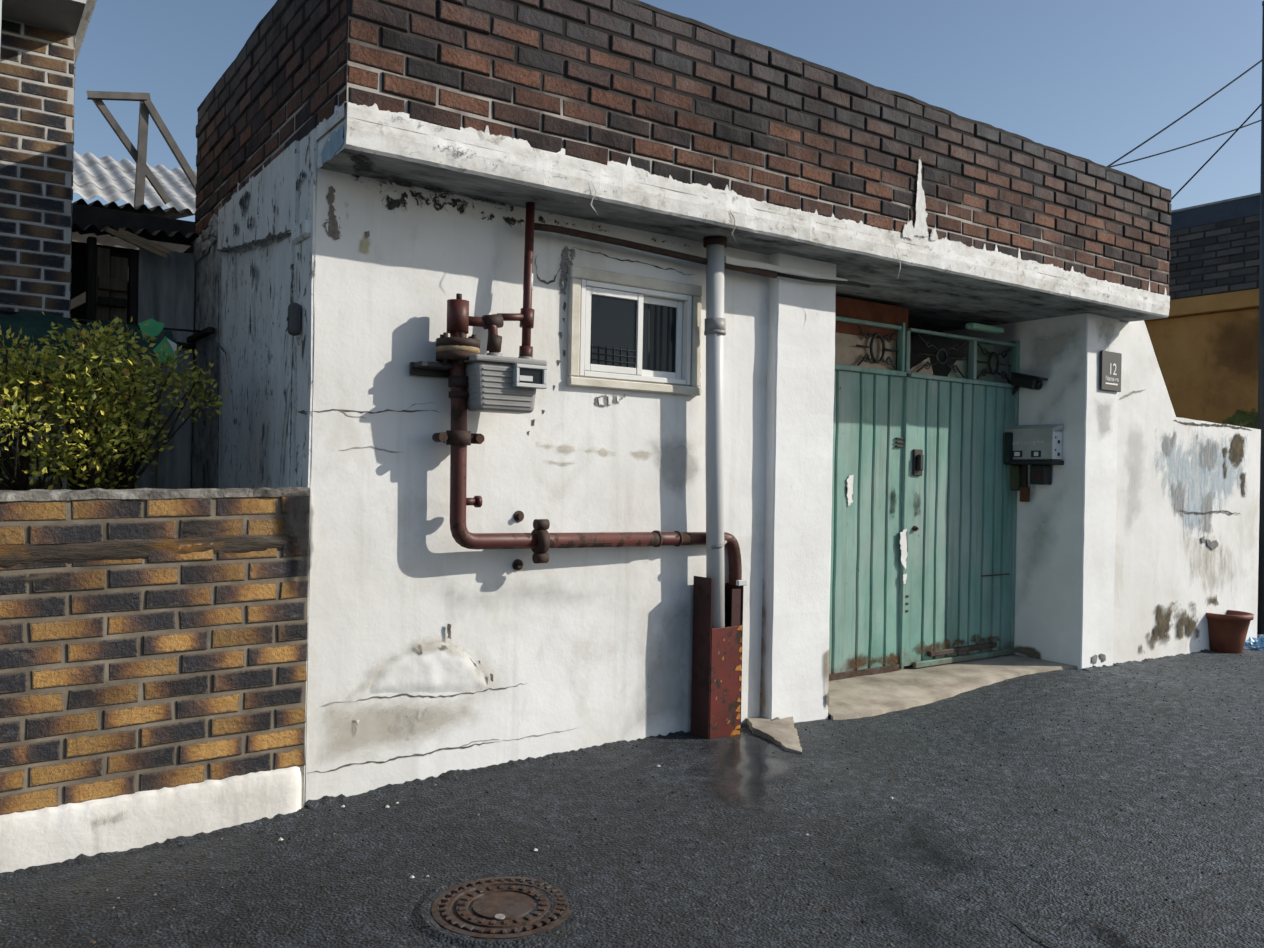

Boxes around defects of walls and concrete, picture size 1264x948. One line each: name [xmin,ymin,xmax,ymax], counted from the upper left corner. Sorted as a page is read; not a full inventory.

peeling [296,125,524,226]
peeling [222,189,253,236]
peeling [322,186,341,240]
crack [217,230,295,469]
crack [279,329,440,486]
peeling [1156,432,1246,550]
crack [321,658,521,707]
corrosion [850,654,900,669]
corrosion [914,634,1000,655]
crack [310,728,575,773]